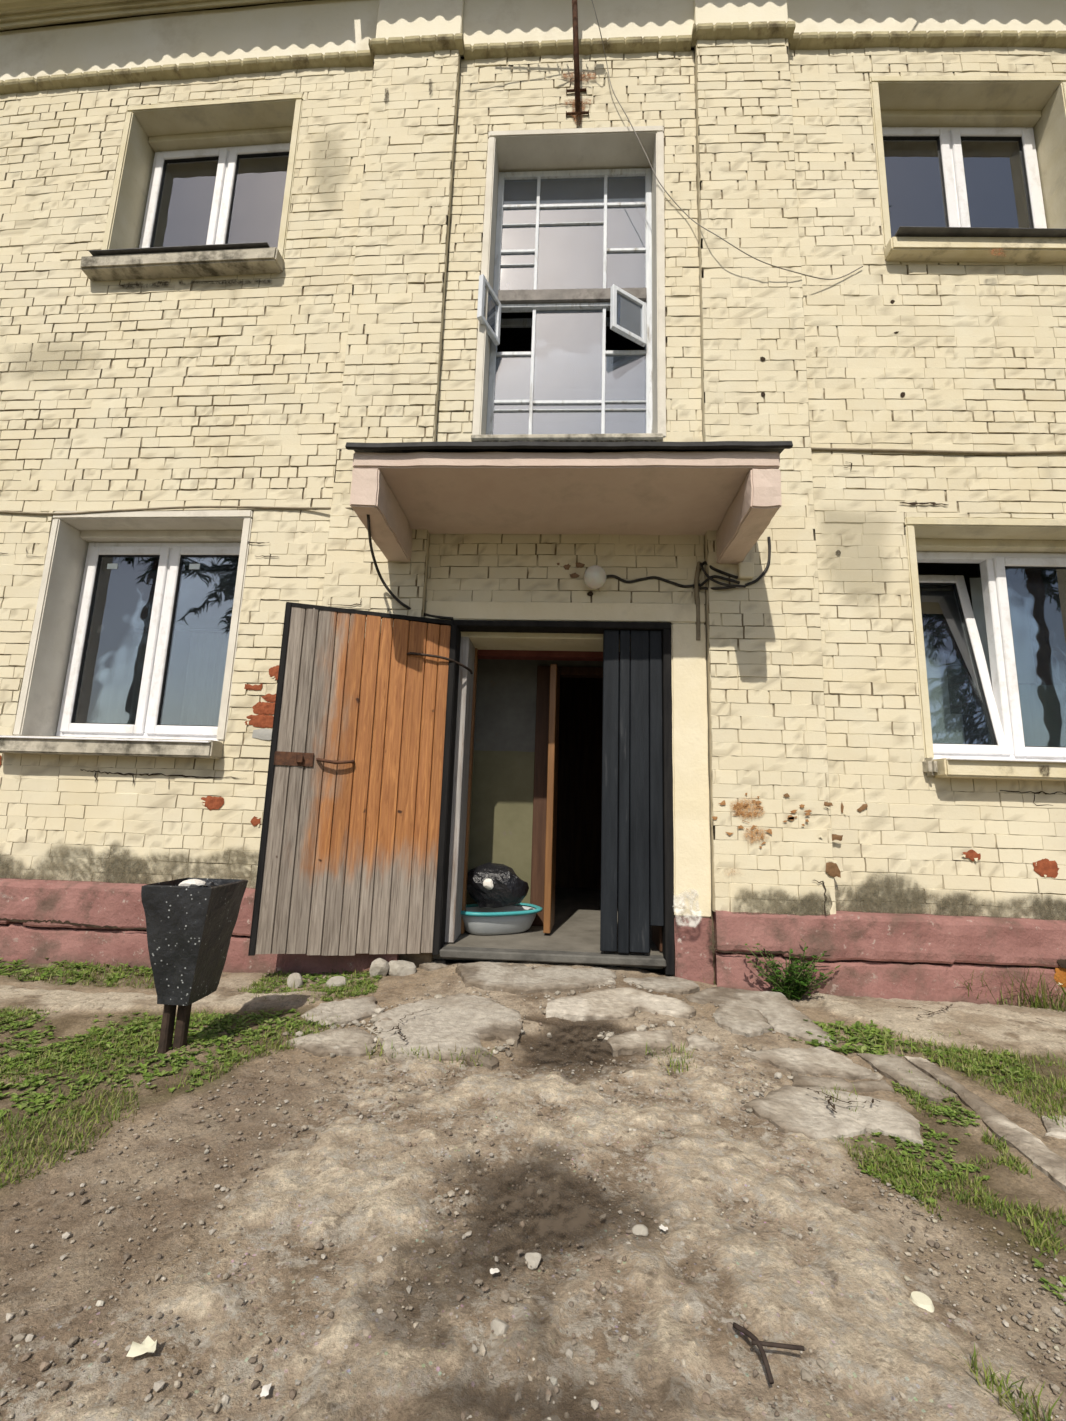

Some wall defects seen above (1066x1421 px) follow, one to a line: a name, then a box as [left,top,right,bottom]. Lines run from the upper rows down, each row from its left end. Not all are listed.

flaking render [244,665,279,728]
flaking render [201,796,224,810]
peeling [712,793,868,848]
damp [0,844,259,889]
spalling [826,859,841,878]
flaking render [1033,858,1060,878]
damp [736,874,1066,920]